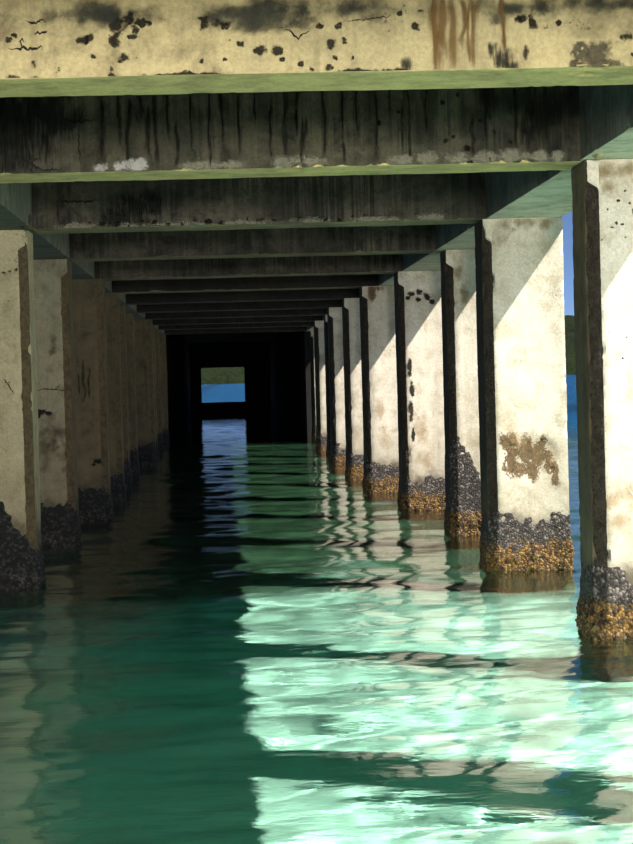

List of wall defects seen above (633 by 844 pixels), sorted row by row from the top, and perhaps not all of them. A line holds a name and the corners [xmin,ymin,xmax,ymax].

leakage [74,1,138,25]
leakage [204,0,308,32]
leakage [337,0,378,16]
leakage [493,2,547,24]
leakage [568,0,633,11]
spalling [500,432,560,486]